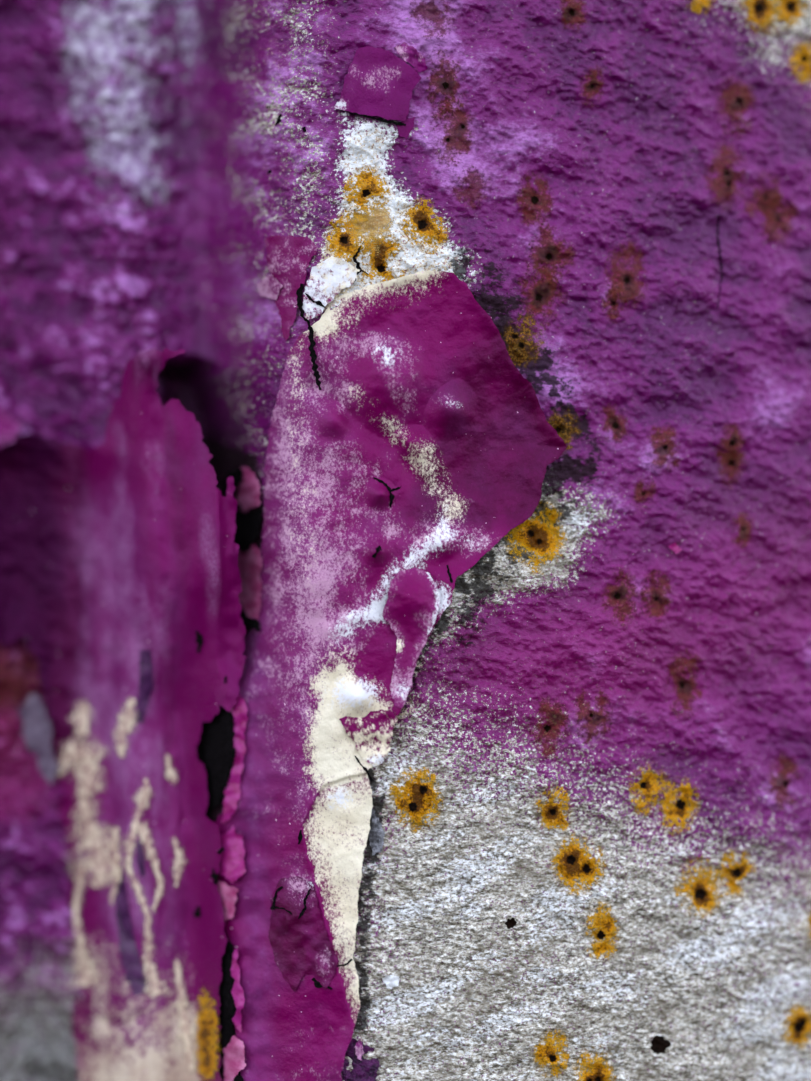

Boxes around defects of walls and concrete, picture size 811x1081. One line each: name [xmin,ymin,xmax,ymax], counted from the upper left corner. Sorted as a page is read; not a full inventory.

corrosion [324,167,448,284]
crack [296,283,325,390]
corrosion [504,502,567,575]
peeling [0,235,567,1081]
corrosion [389,767,444,833]
corrosion [534,786,606,895]
crack [270,886,311,919]
corrosion [585,901,620,959]
corrosion [674,849,756,918]
crack [311,959,352,990]
corrosion [533,1029,617,1081]
corrosion [651,1035,671,1054]